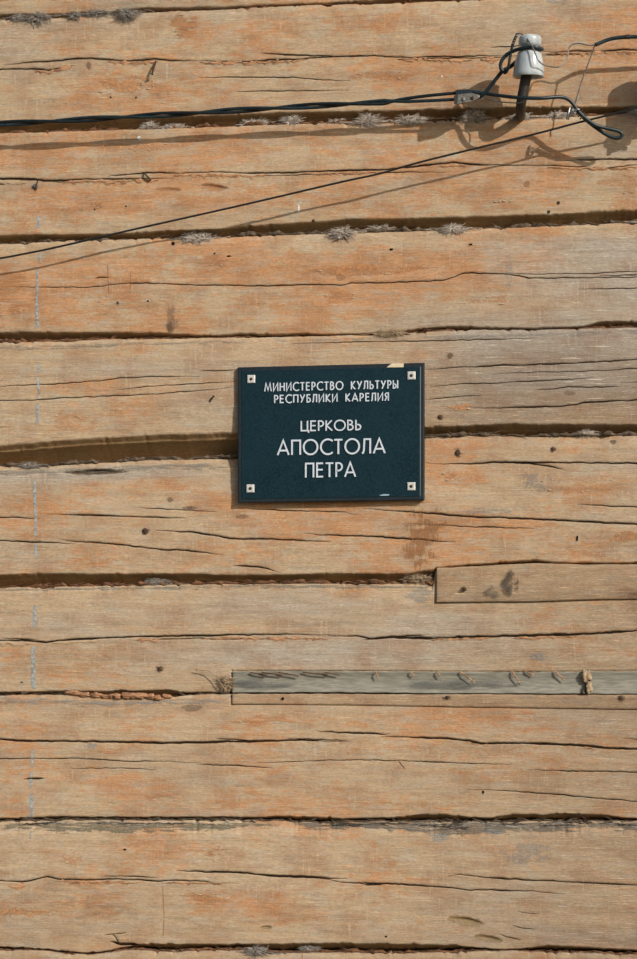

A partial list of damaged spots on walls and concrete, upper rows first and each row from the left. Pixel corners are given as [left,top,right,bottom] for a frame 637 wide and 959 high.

crack [0,45,519,92]
crack [0,158,637,185]
crack [426,461,637,469]
crack [0,504,637,572]
crack [0,731,637,802]
crack [0,870,635,940]